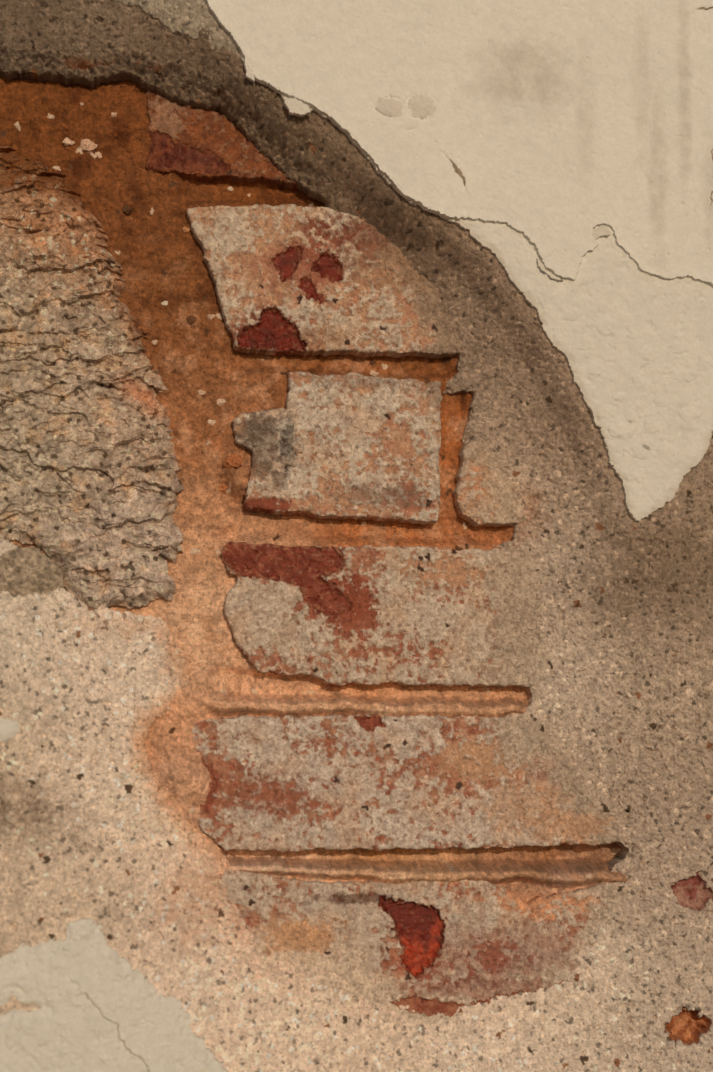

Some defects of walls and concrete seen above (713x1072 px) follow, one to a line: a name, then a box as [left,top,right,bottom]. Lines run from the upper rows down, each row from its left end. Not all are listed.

spalling [0,53,336,211]
peeling [112,0,713,522]
spalling [222,542,352,617]
spalling [354,716,386,731]
spalling [206,764,216,797]
spalling [671,872,713,911]
spalling [378,895,446,978]
crack [84,993,149,1072]
spalling [390,982,561,1017]
spalling [661,1006,712,1045]